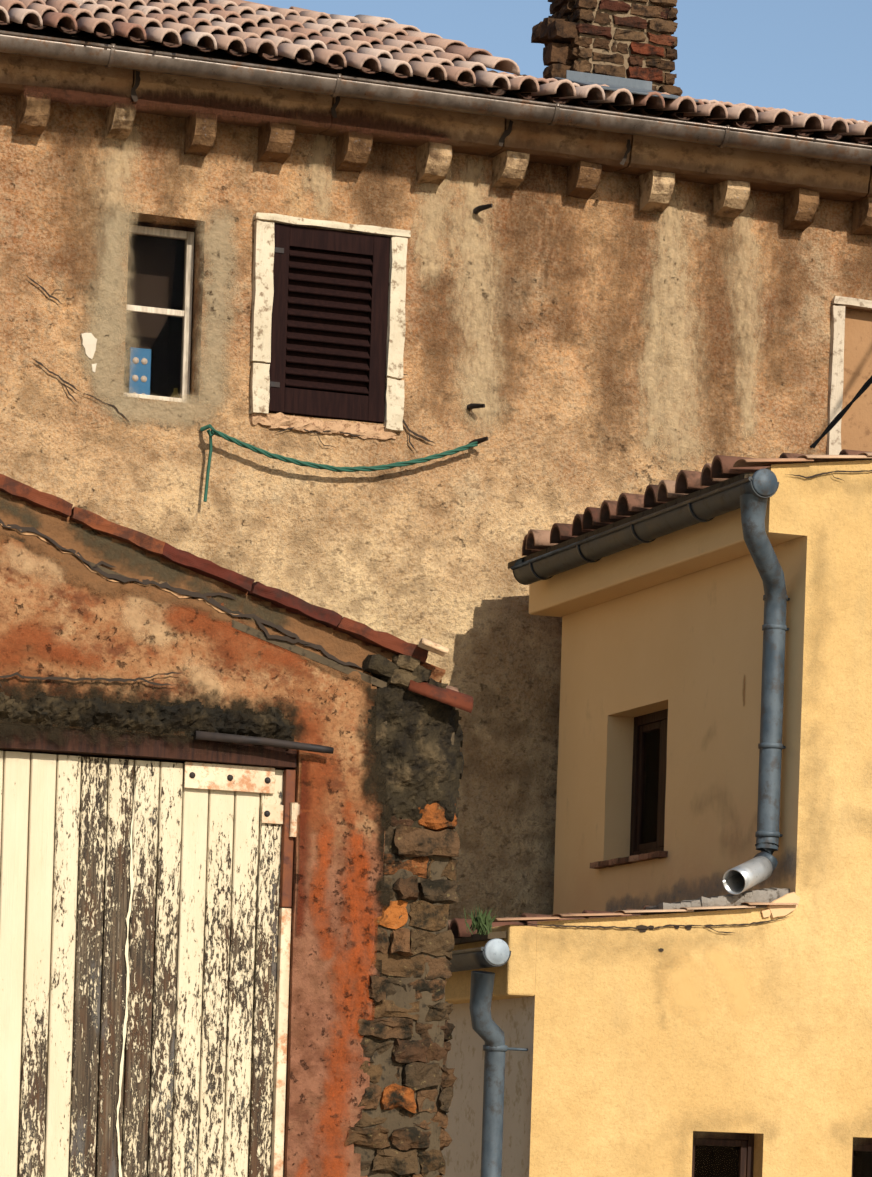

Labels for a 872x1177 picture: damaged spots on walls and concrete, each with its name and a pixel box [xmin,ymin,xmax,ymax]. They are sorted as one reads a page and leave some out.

crack [26,275,64,305]
spalling [81,333,97,372]
damp [639,187,703,465]
damp [724,198,763,435]
crack [32,358,130,423]
crack [785,470,872,481]
crack [0,519,372,675]
damp [0,676,304,751]
damp [606,880,724,912]